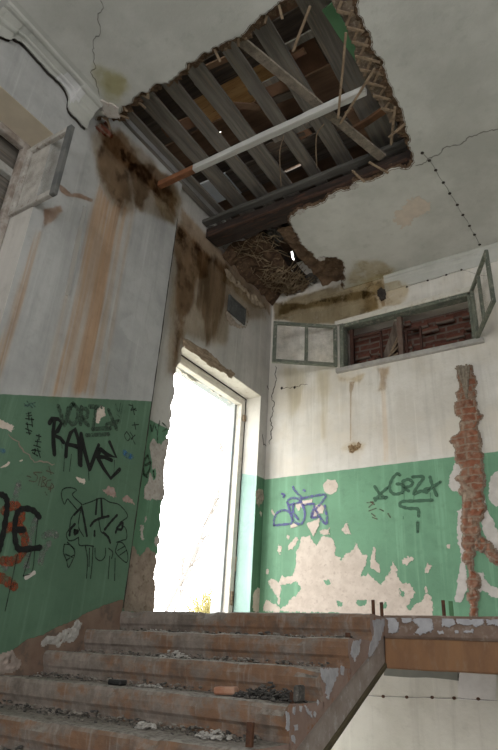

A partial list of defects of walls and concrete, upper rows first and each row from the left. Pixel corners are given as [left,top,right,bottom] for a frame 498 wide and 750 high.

crack [0,37,85,130]
crack [90,0,104,96]
spalling [95,0,295,140]
spalling [287,0,415,261]
crack [415,129,498,246]
crack [262,366,306,446]
peeling [144,438,170,501]
peeling [252,364,498,662]
peeling [0,516,160,675]
peeling [284,666,344,744]